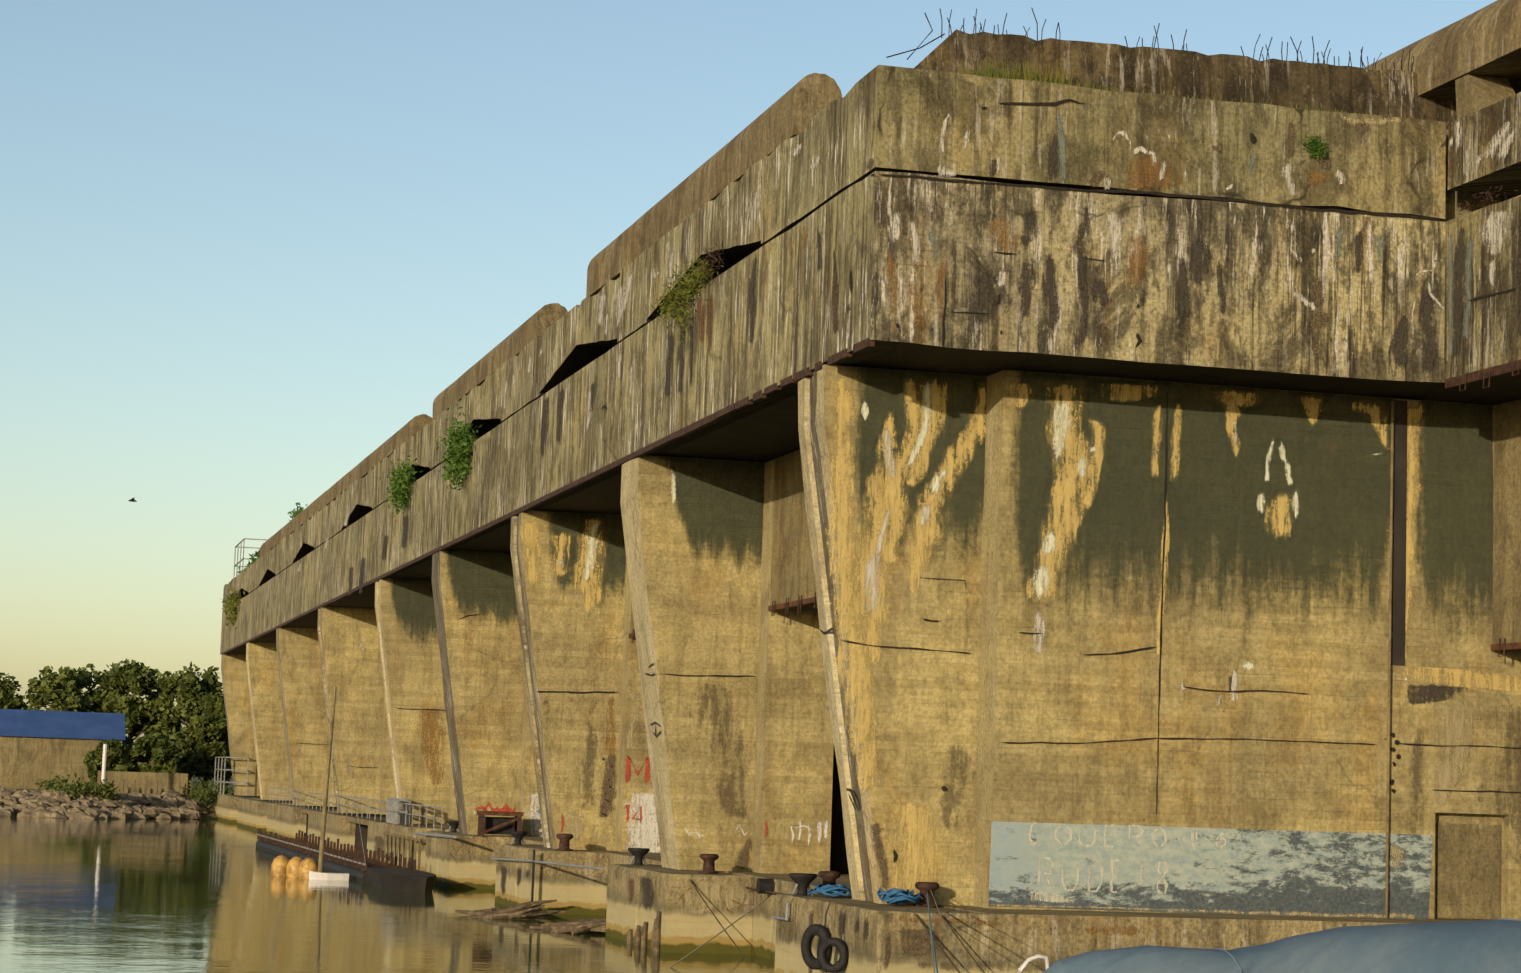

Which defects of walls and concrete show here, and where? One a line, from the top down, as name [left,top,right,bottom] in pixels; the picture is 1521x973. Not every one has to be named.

water stain [1449,121,1462,146]
water stain [1477,121,1514,163]
water stain [974,210,1060,328]
water stain [1076,206,1126,343]
water stain [1175,237,1226,318]
water stain [1335,229,1385,275]
water stain [826,368,987,790]
water stain [1008,371,1521,807]